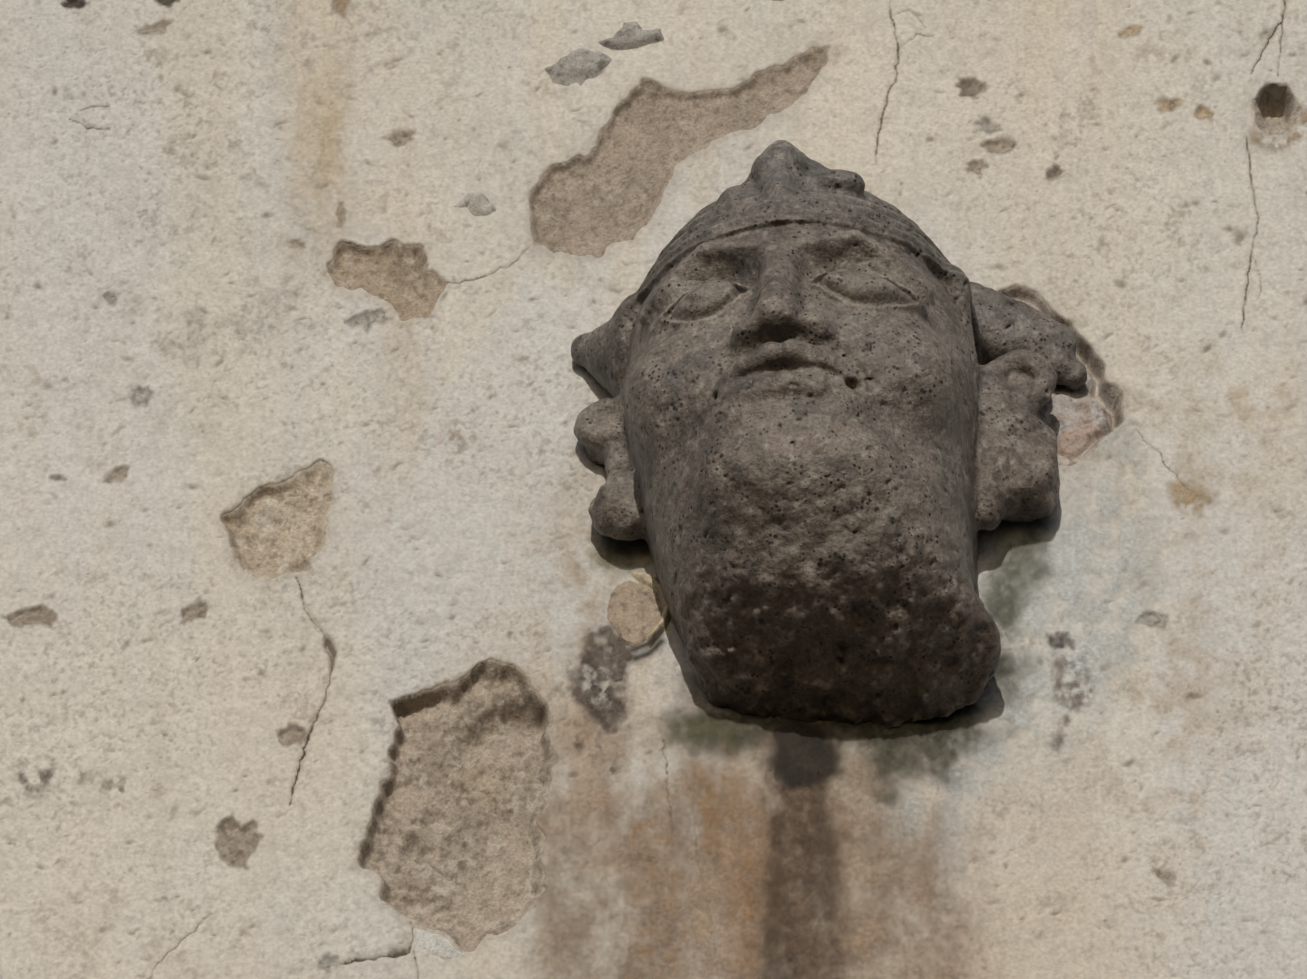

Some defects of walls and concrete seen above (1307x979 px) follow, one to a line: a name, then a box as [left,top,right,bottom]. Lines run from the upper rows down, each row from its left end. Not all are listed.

flaking render [529,47,830,258]
crack [1252,1,1285,71]
spalling [1252,87,1302,136]
flaking render [327,240,448,330]
flaking render [221,461,334,582]
crack [290,640,335,804]
flaking render [358,660,559,961]
water stain [611,718,888,979]